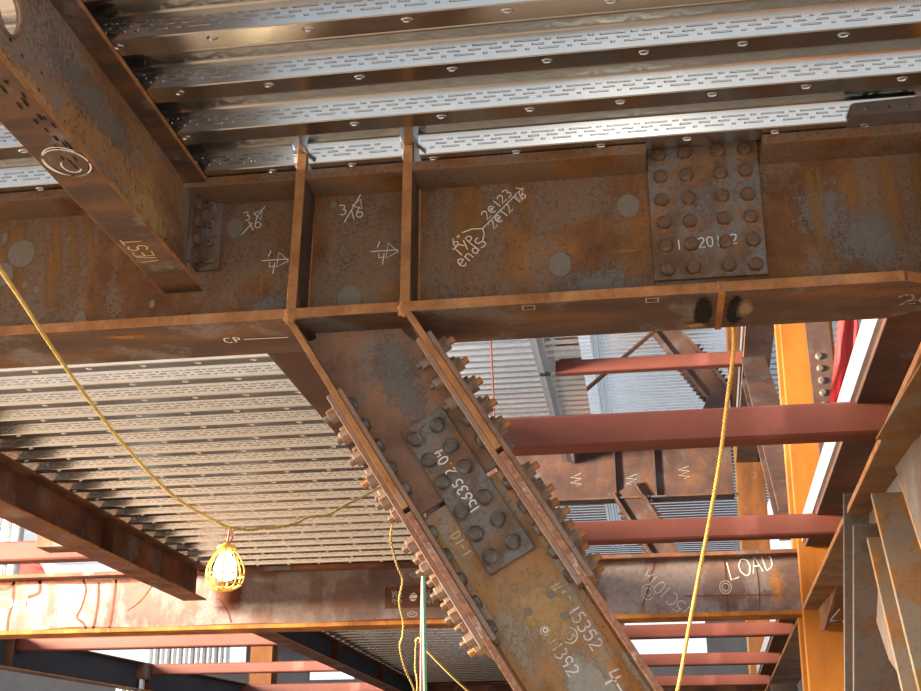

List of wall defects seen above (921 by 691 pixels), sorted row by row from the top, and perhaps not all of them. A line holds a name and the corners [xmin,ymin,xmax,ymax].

corrosion [0,578,152,631]
corrosion [190,575,284,626]
corrosion [512,584,572,649]
corrosion [684,560,784,612]